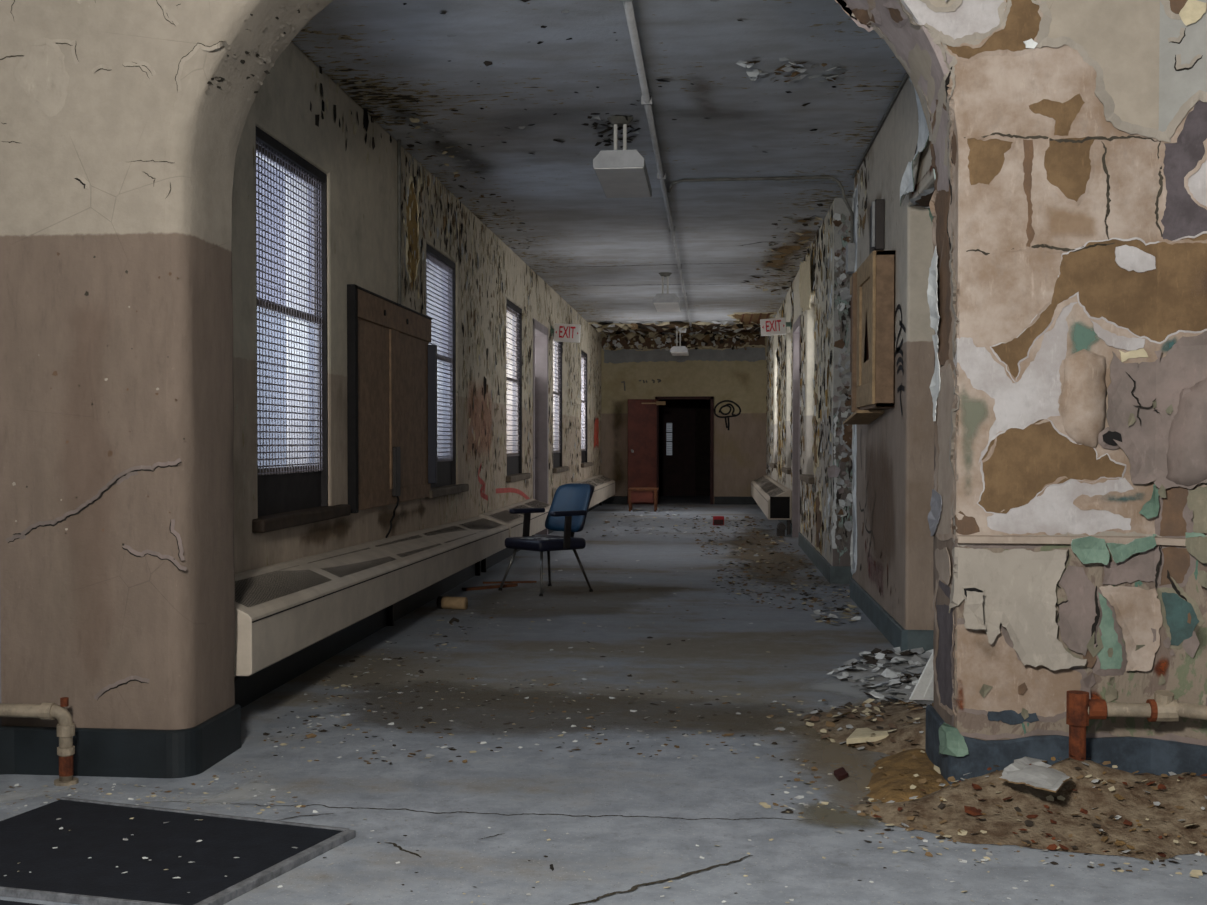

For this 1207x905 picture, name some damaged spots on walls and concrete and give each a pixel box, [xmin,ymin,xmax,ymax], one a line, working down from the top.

crack [0,0,228,92]
peeling [736,57,848,93]
peeling [582,79,670,149]
peeling [548,151,899,603]
crack [6,458,181,543]
crack [122,519,187,572]
crack [94,675,150,701]
corrosion [59,755,73,777]
crack [569,855,753,905]